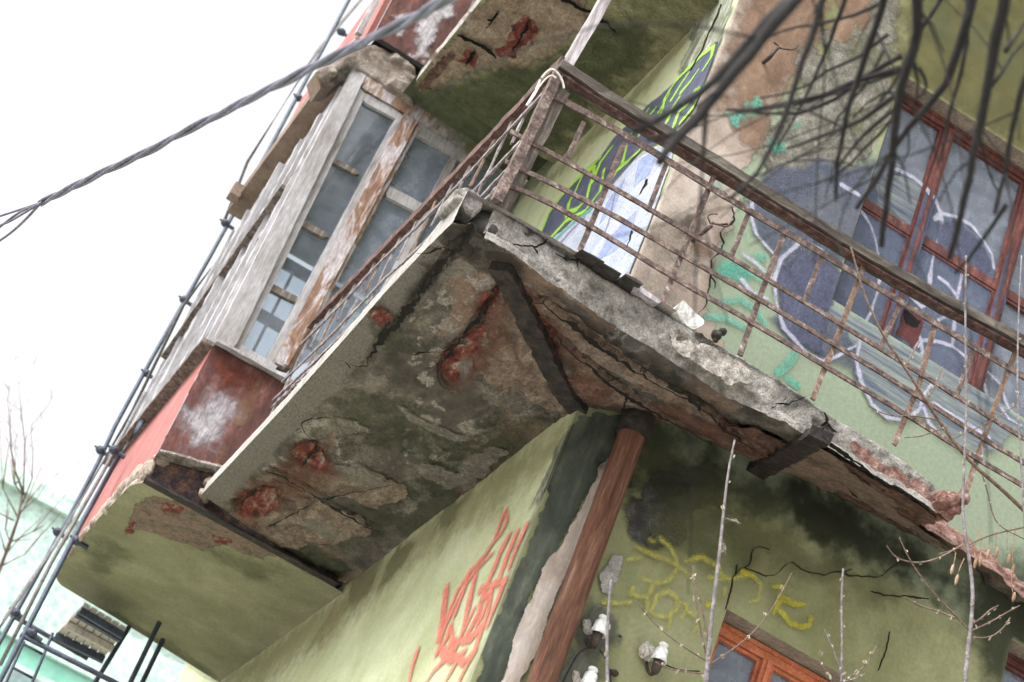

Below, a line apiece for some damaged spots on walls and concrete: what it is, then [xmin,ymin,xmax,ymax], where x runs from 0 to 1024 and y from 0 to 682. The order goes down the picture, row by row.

peeling [412,0,587,93]
peeling [678,0,902,176]
peeling [631,156,753,385]
crack [528,299,758,458]
peeling [125,441,408,558]
crack [233,417,388,533]
peeling [441,287,783,682]
damp [628,421,949,582]
crack [725,546,929,609]
crack [878,632,890,671]